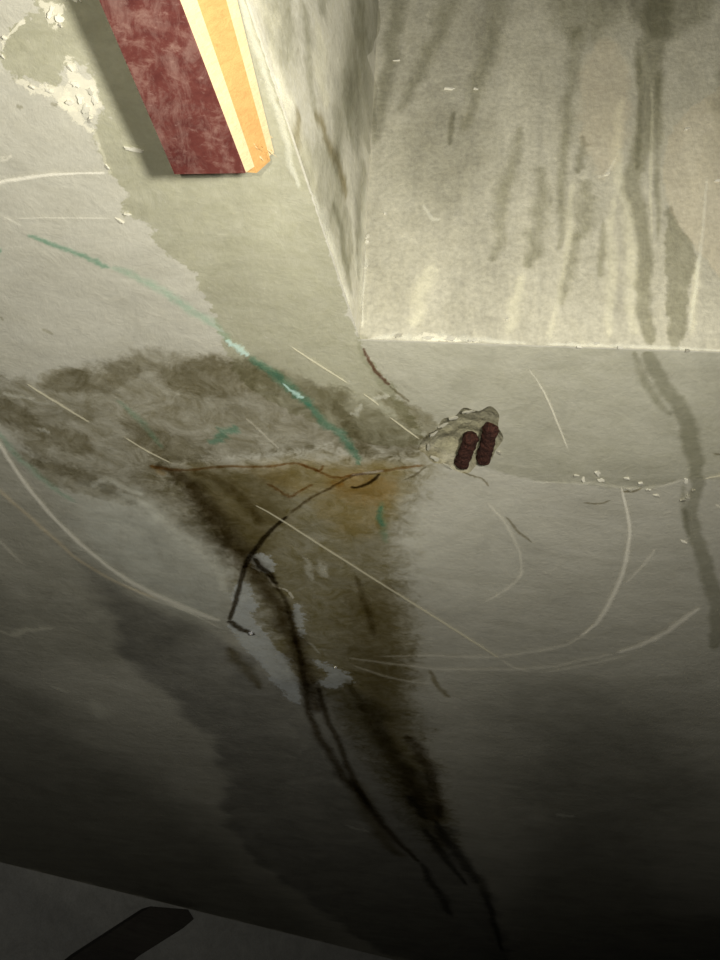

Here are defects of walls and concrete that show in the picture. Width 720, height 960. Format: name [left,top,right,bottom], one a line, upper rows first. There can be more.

flaking render [47,5,65,28]
spalling [418,406,503,474]
crack [228,517,287,635]
water stain [165,469,415,857]